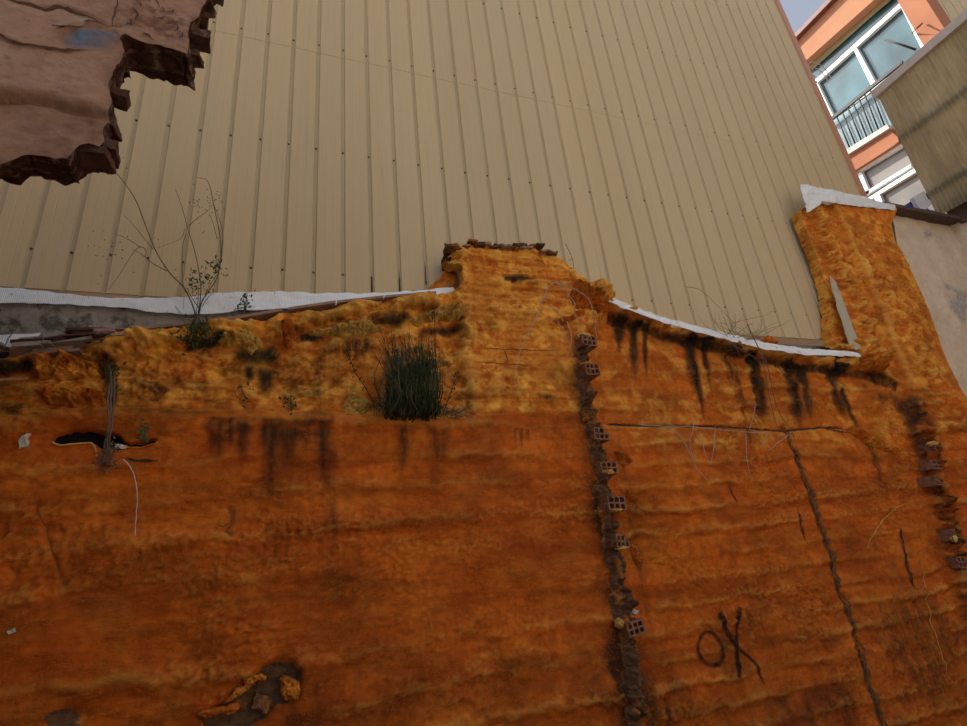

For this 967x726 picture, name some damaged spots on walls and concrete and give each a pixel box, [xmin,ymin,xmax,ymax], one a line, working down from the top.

crack [0,0,183,51]
spalling [189,0,224,69]
spalling [76,87,131,174]
damp [608,313,898,421]
damp [208,419,249,448]
damp [261,419,328,479]
crack [609,423,888,726]
crack [900,528,914,586]
spalling [198,662,301,726]